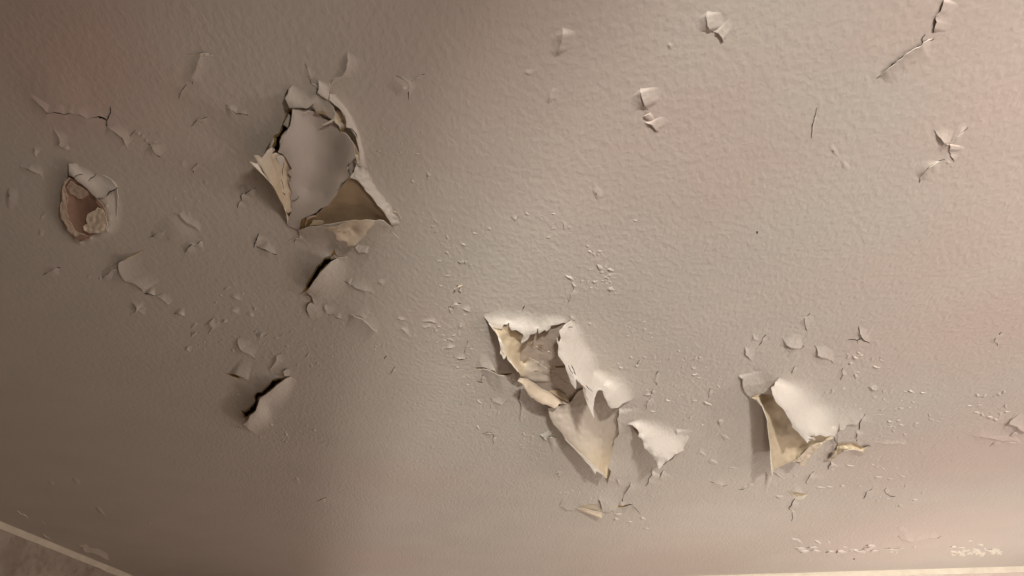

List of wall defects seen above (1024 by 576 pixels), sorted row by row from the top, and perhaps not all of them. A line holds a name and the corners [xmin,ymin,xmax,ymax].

flaking render [53,164,124,247]
peeling [251,50,401,320]
peeling [934,122,968,155]
peeling [103,249,174,316]
peeling [226,330,297,434]
peeling [443,285,693,518]
peeling [738,333,869,494]